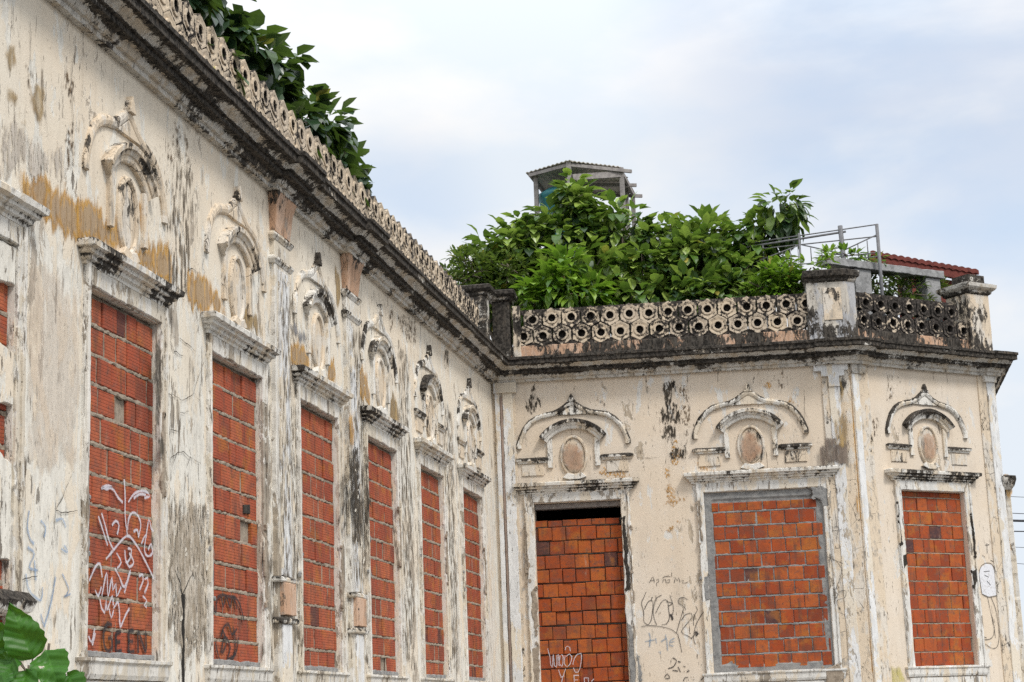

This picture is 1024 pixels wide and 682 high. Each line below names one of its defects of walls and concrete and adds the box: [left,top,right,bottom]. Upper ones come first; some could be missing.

leakage [302,270,340,329]
leakage [368,311,416,371]
leakage [660,380,690,459]
leakage [819,414,849,466]
leakage [342,444,371,545]